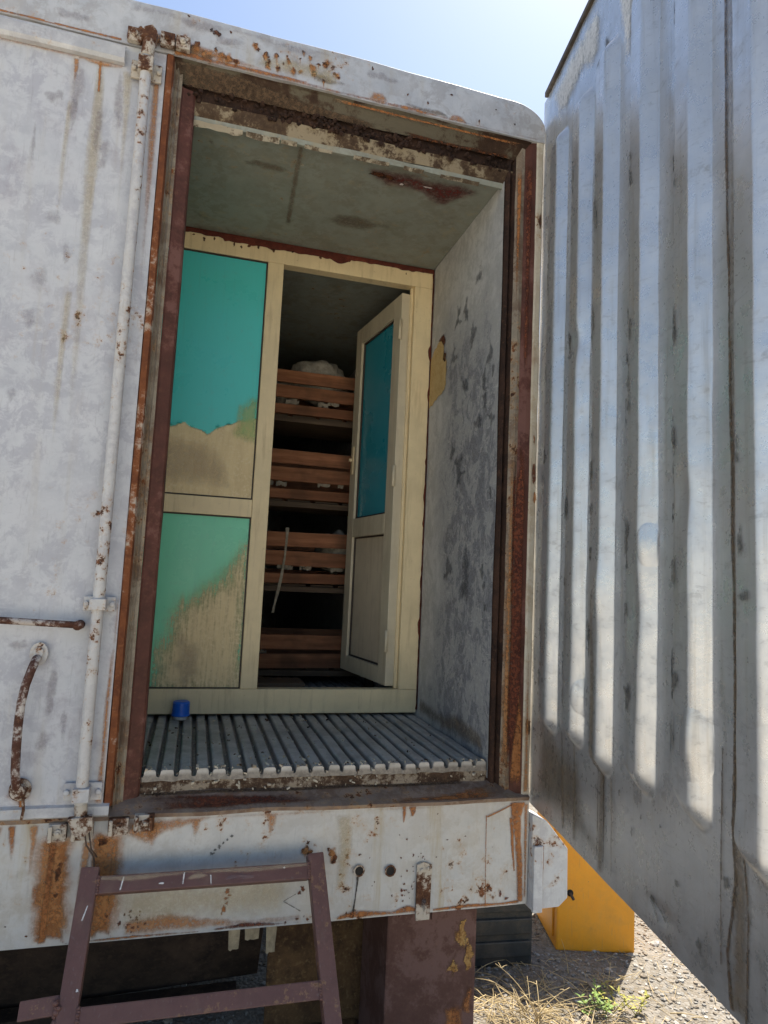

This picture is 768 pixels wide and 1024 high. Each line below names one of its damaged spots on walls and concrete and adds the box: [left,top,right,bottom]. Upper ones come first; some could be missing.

corrosion [148,84,158,193]
peeling [194,120,333,154]
corrosion [175,40,515,158]
peeling [429,335,447,408]
peeling [165,402,258,500]
peeling [152,546,249,689]
corrosion [502,449,524,781]
corrosion [25,827,68,943]
corrosion [81,835,120,876]
corrosion [90,895,169,941]
corrosion [338,853,437,919]
corrosion [433,802,544,911]